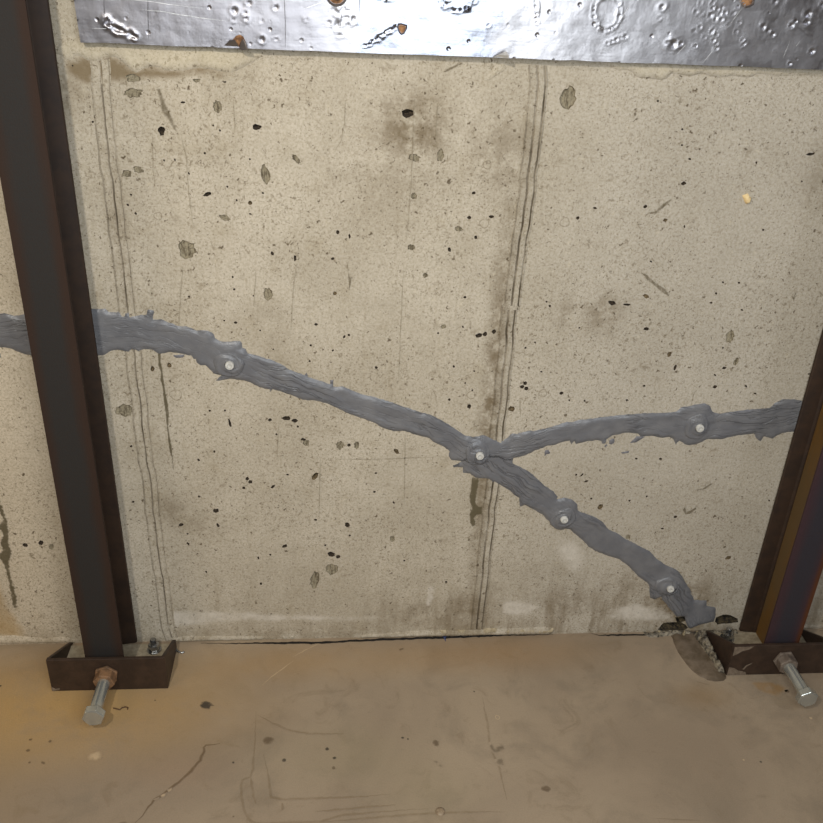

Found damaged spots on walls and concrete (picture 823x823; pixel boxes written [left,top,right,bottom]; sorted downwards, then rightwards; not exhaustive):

crack [347,440,429,498]
damp [469,477,482,527]
spalling [658,617,688,631]
spalling [715,614,738,625]
crack [208,634,549,644]